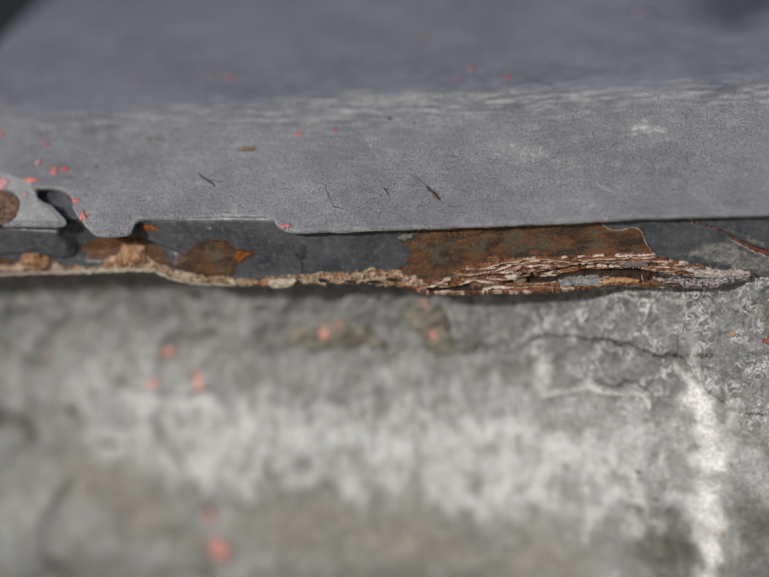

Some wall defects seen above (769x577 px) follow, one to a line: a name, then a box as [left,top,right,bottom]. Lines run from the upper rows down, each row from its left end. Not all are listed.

rust [0,222,706,296]
crack [528,334,766,416]